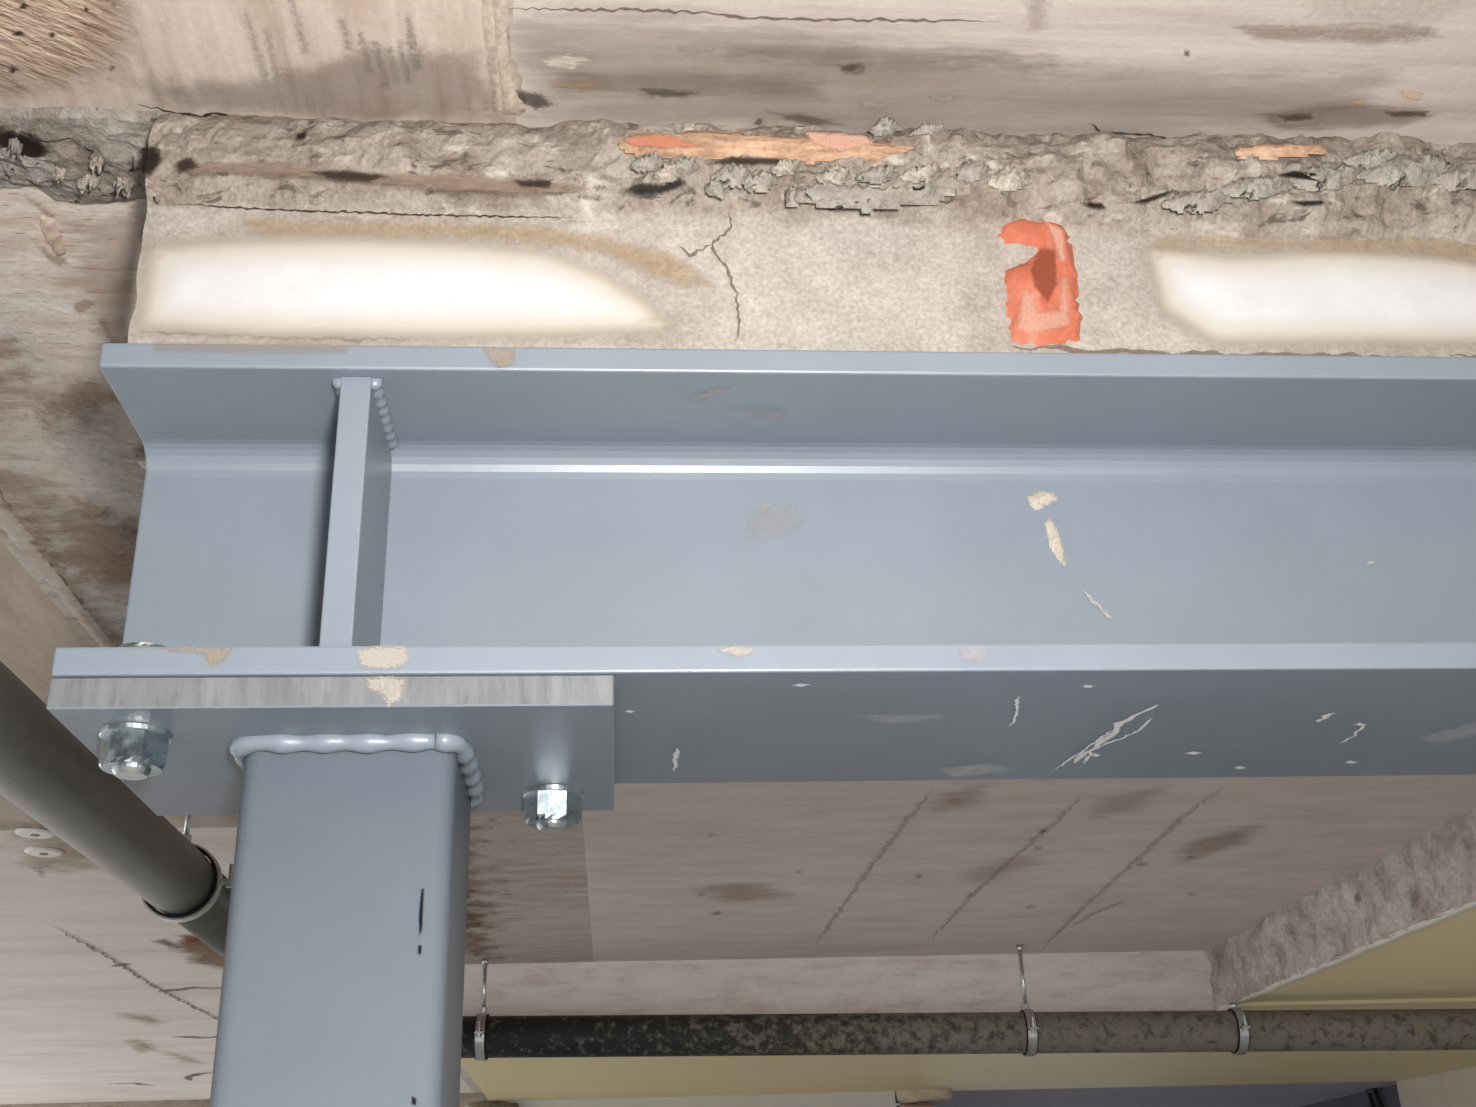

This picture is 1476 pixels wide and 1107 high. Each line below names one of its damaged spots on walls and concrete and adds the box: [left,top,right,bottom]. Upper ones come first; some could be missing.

crack [507,7,1001,23]
peeling [7,128,23,159]
peeling [89,153,143,198]
spalling [188,161,579,193]
flaking render [620,101,1033,207]
peeling [1162,147,1399,214]
peeling [1435,162,1476,192]
crack [680,212,741,341]
water stain [57,426,142,515]
crack [814,784,935,946]
crack [932,793,1087,938]
crack [1041,786,1228,950]